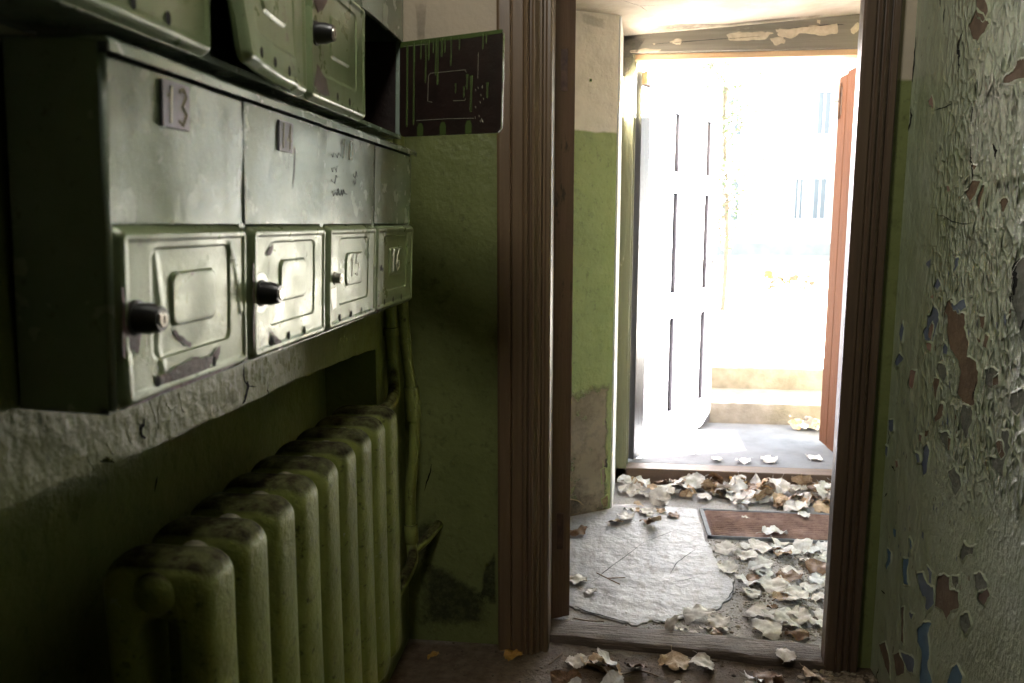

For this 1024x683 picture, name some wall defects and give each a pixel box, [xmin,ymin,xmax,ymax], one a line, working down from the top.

peeling [727,20,859,46]
peeling [968,0,991,44]
peeling [1002,52,1024,95]
peeling [958,163,1010,222]
peeling [914,254,1024,498]
peeling [570,387,609,516]
peeling [879,529,977,683]
peeling [974,571,991,608]